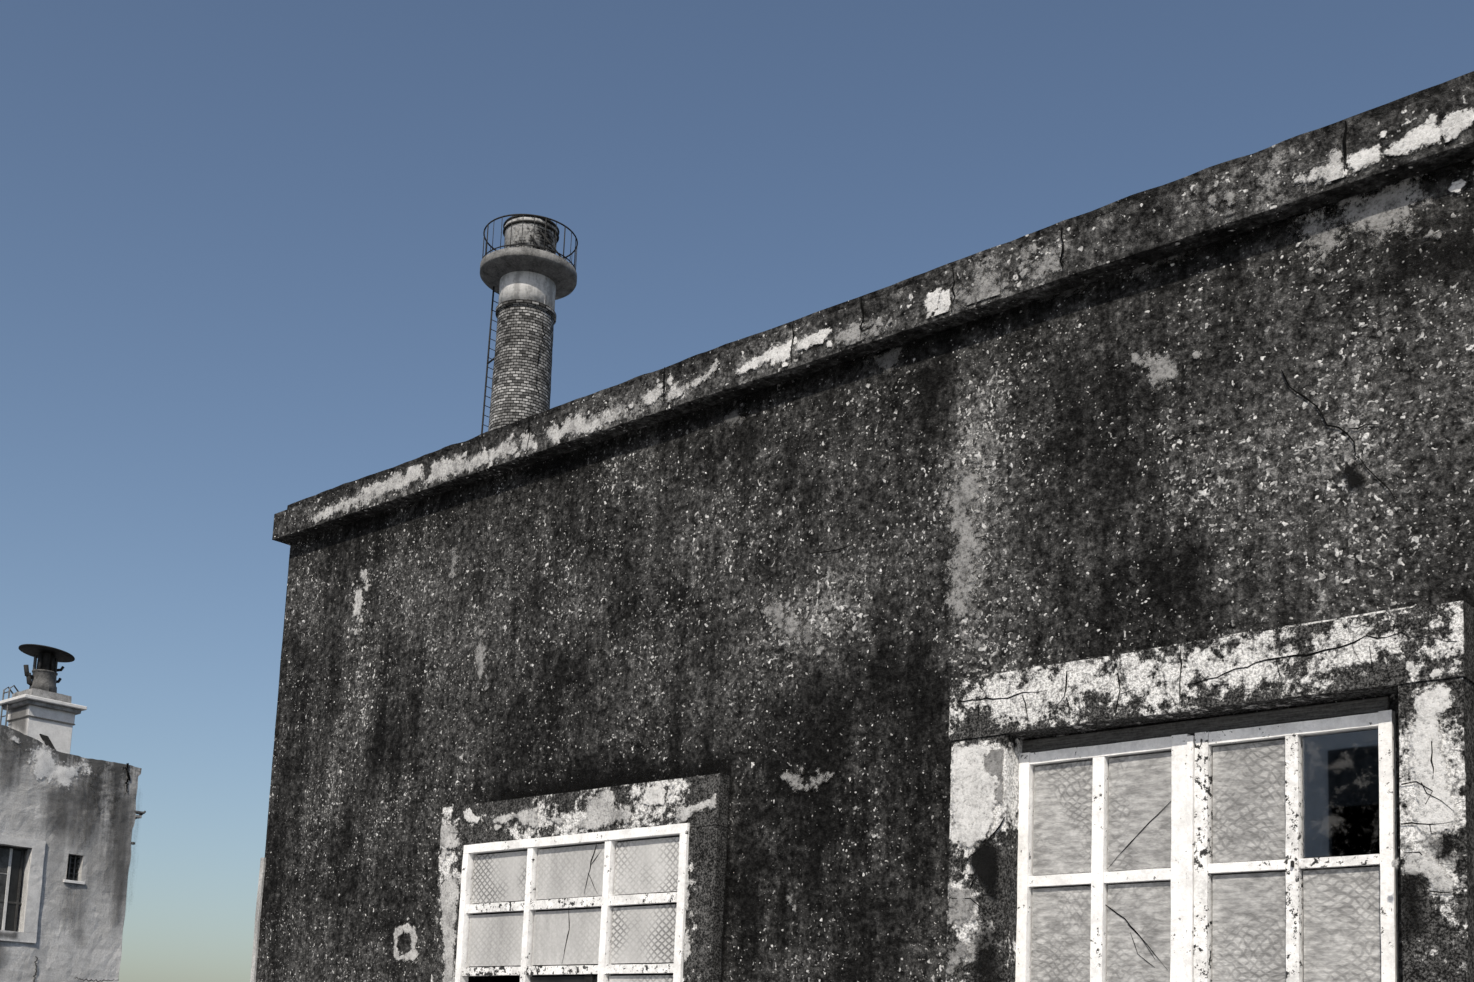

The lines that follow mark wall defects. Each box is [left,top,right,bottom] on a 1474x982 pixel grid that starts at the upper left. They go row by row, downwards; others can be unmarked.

peeling [1294,108,1474,183]
flaking render [1289,160,1474,274]
peeling [736,315,903,374]
peeling [298,358,719,531]
flaking render [937,457,986,631]
water stain [11,705,26,731]
water stain [115,797,131,913]
peeling [440,781,716,860]
water stain [486,762,731,982]
peeling [946,742,1004,976]
peeling [1391,660,1462,894]
flaking render [393,923,418,962]